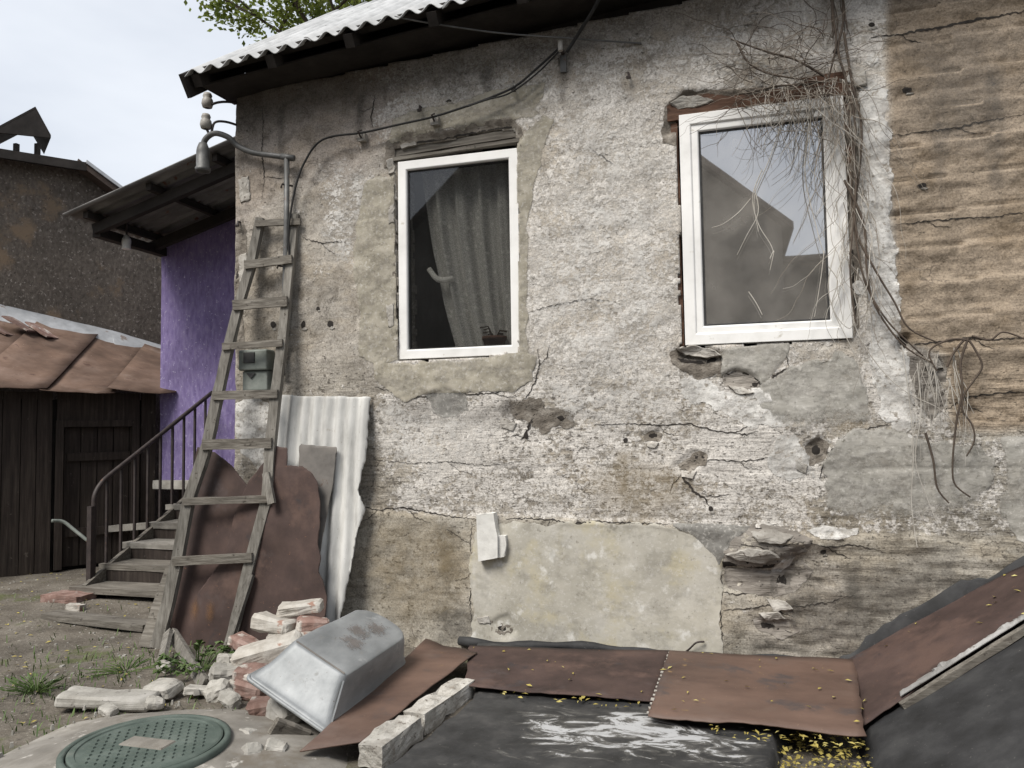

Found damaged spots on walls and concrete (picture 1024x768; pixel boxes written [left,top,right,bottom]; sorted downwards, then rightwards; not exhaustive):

crack [871,10,1024,43]
spalling [661,83,799,146]
crack [898,212,1024,228]
crack [375,348,549,473]
peeling [669,345,829,482]
crack [595,423,781,508]
crack [506,517,670,525]
spalling [722,523,859,640]